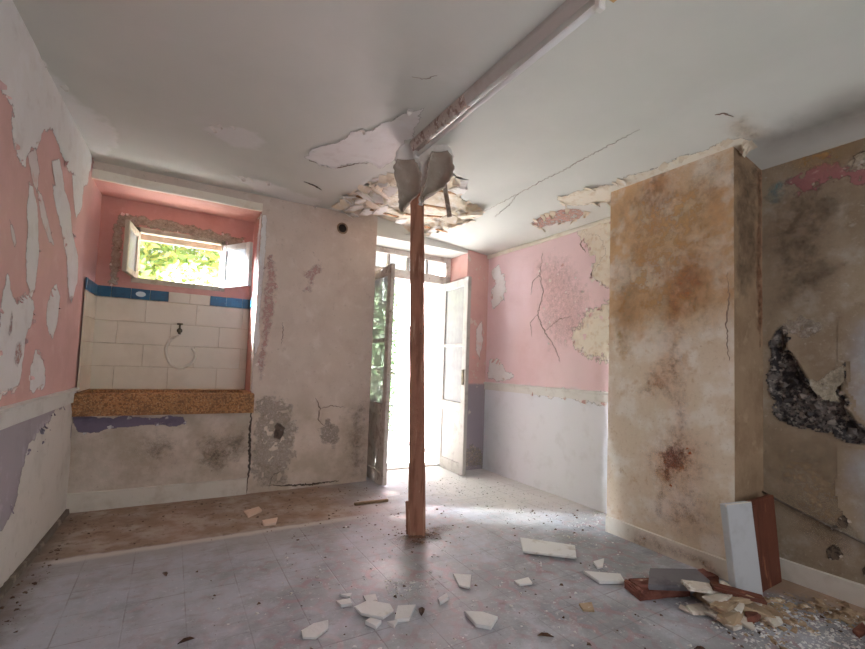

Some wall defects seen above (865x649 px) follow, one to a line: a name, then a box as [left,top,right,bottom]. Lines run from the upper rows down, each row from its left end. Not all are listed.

peeling [0,0,120,400]
peeling [109,212,245,286]
peeling [305,109,423,234]
flaking render [424,175,485,236]
crack [530,254,566,357]
flaking render [556,300,609,364]
peeling [530,138,757,288]
leakage [618,188,716,322]
flaking render [766,320,865,444]
peeling [0,404,187,588]